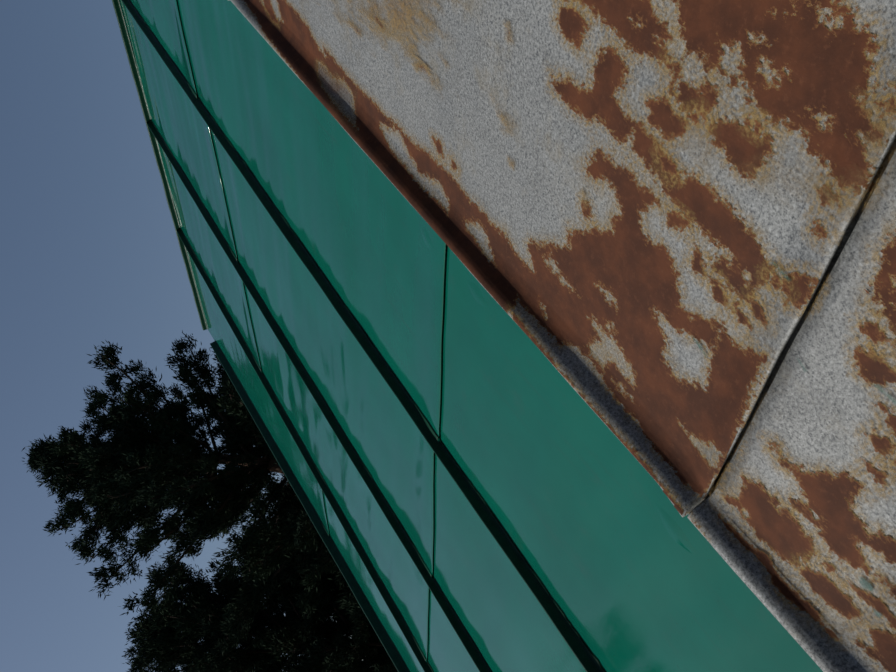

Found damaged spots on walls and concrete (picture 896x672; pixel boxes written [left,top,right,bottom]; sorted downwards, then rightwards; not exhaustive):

rust [242,0,896,672]